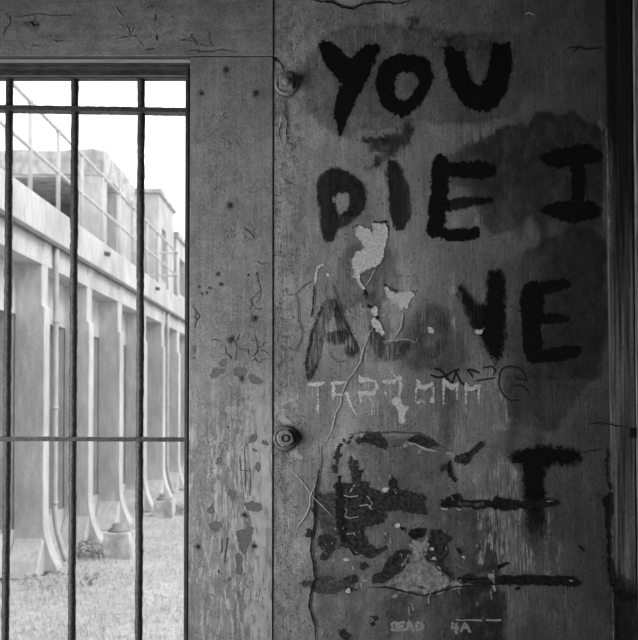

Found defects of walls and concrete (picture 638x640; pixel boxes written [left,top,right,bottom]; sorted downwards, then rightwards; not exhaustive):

crack [314,0,410,10]
crack [178,32,235,53]
leakage [414,112,609,229]
flaking render [351,220,389,335]
flaking render [384,284,415,311]
crack [388,312,417,343]
crack [210,329,268,363]
crack [349,431,453,453]
peeling [397,434,438,453]
peeling [440,441,484,483]
peeling [301,452,580,604]
crack [367,584,500,611]